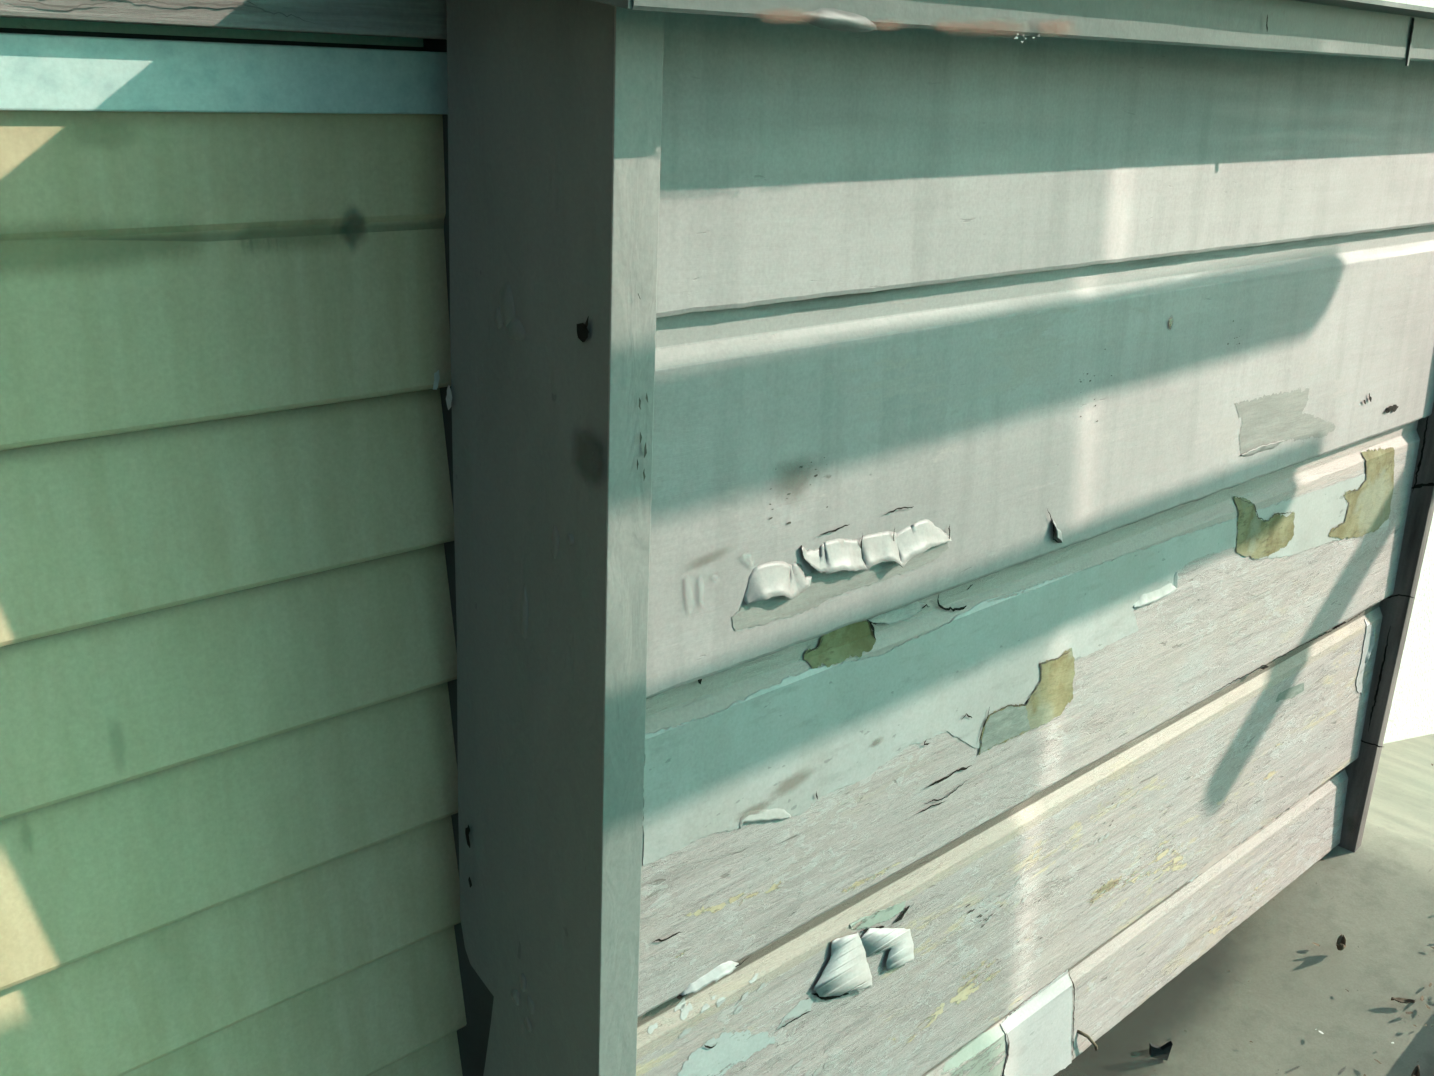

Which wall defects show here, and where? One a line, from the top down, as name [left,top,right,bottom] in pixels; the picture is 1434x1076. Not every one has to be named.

peeling [642,447,1395,866]
peeling [674,900,914,1076]
peeling [941,970,1075,1076]